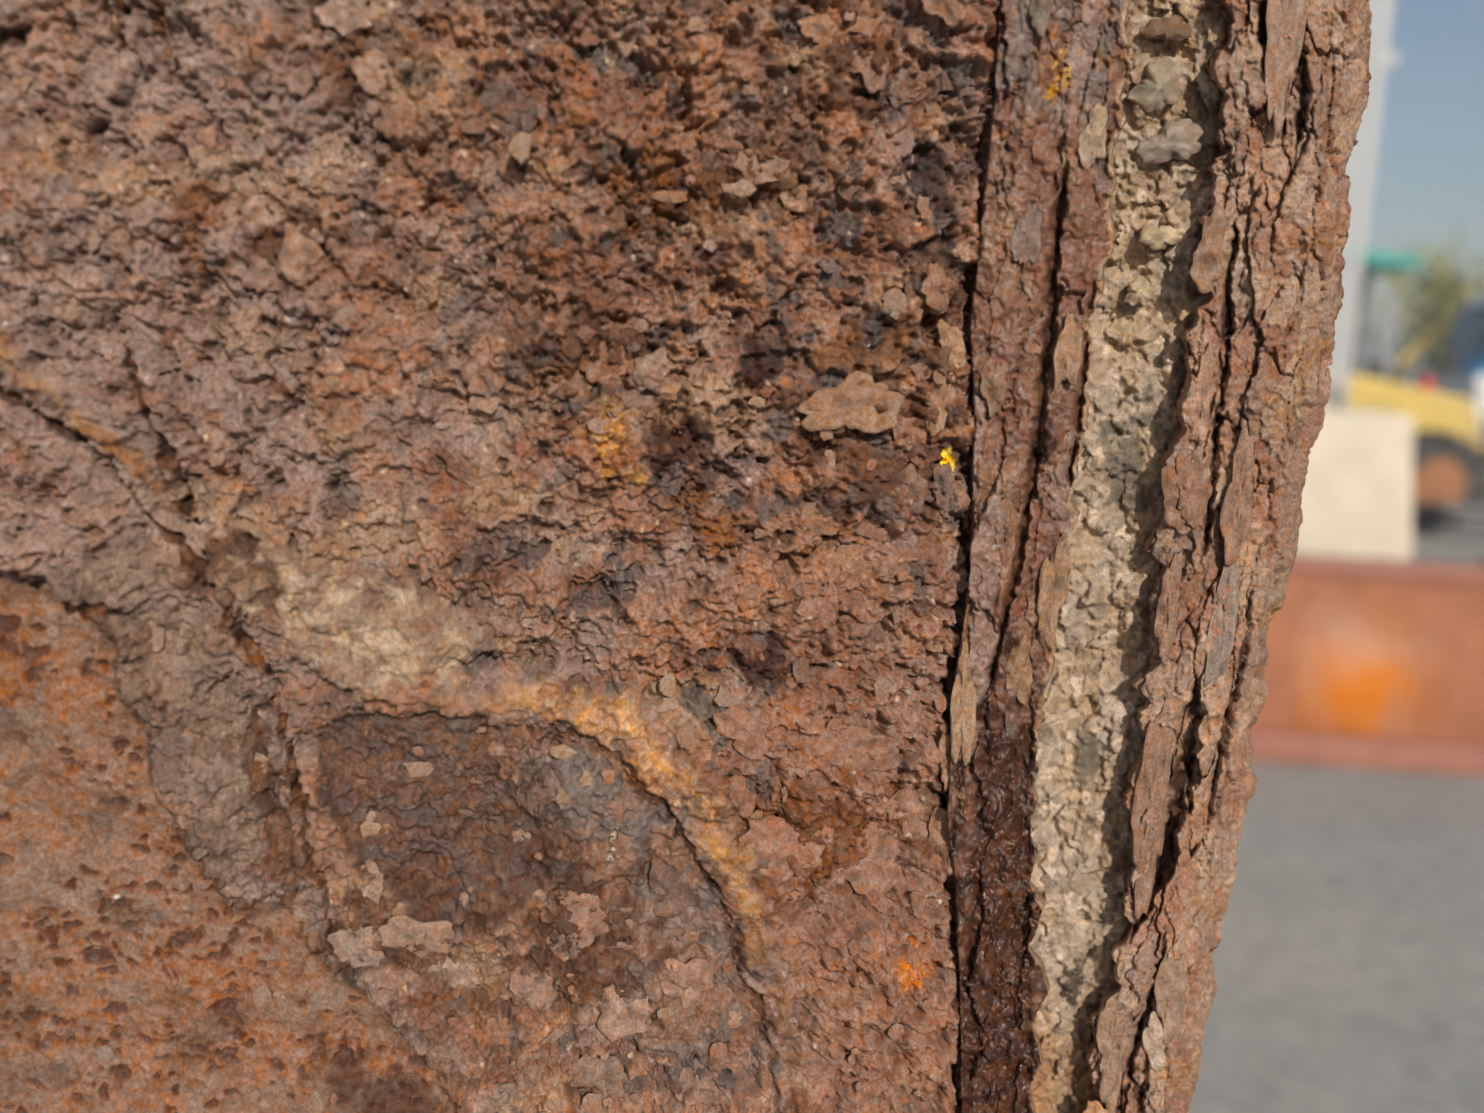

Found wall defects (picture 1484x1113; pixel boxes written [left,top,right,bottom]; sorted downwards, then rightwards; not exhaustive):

corrosion [1044,50,1071,104]
crack [1256,0,1310,161]
corrosion [172,181,267,272]
crack [958,5,999,485]
crack [0,341,318,907]
corrosion [593,396,649,489]
crack [937,155,1095,1113]
corrosion [1066,0,1372,1113]
crack [1199,207,1242,568]
corrosion [508,685,766,936]
crack [591,737,765,1014]
corrosion [894,936,940,992]